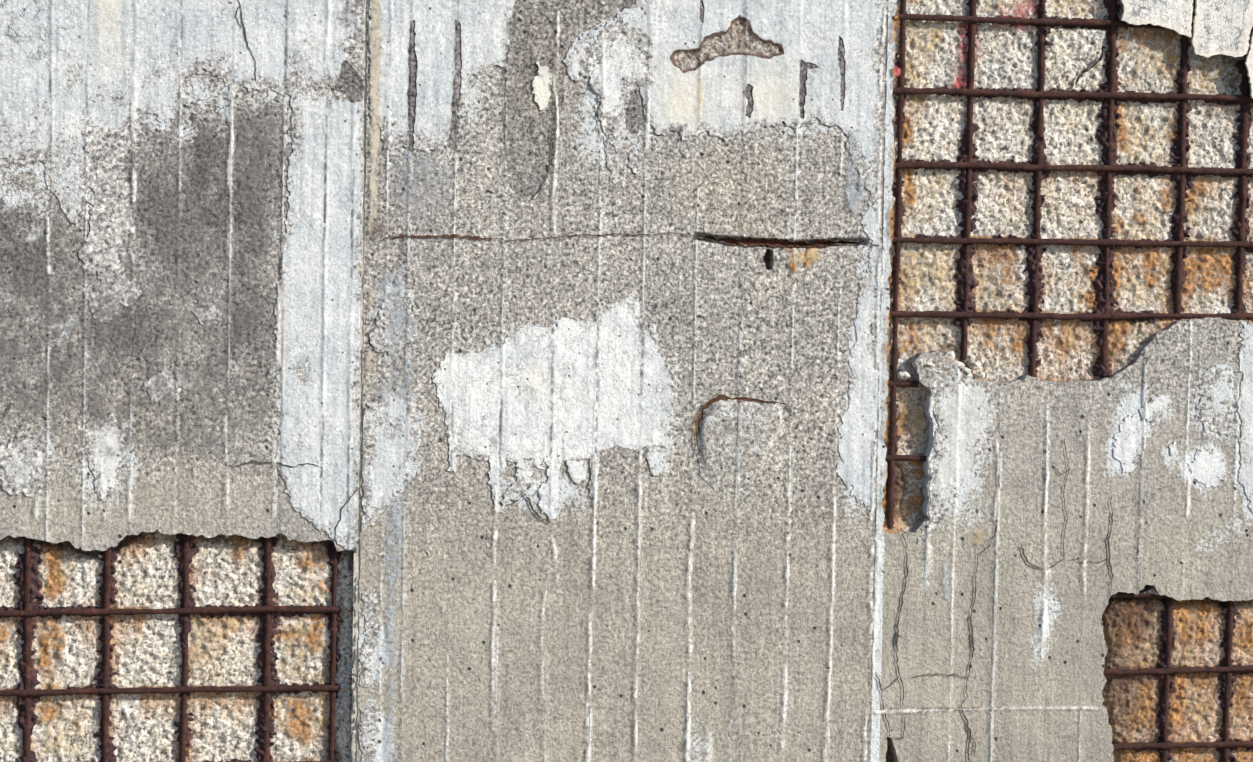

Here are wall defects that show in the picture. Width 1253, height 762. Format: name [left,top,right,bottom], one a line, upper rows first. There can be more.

water stain [0,80,283,509]
rust [889,94,927,240]
spalling [882,0,1253,544]
rust [1114,102,1155,161]
rust [1078,177,1207,307]
rust [1182,237,1233,295]
spalling [0,0,885,762]
rust [40,543,73,599]
rust [35,619,85,750]
crack [870,438,1113,761]
rust [1112,598,1216,762]
spalling [1102,585,1253,762]